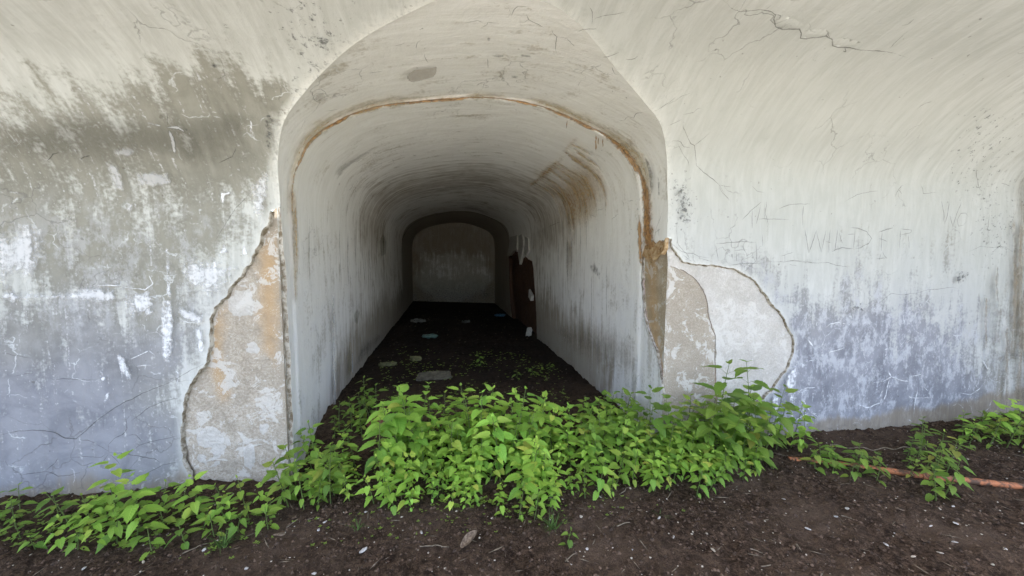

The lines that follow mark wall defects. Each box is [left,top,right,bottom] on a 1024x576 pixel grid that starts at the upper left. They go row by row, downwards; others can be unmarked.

damp [253,180,265,213]
rust [292,96,654,264]
damp [0,229,36,275]
damp [185,248,231,291]
damp [71,276,203,376]
spalling [180,207,294,482]
spalling [641,237,795,434]
crack [15,386,175,473]
damp [773,366,796,418]